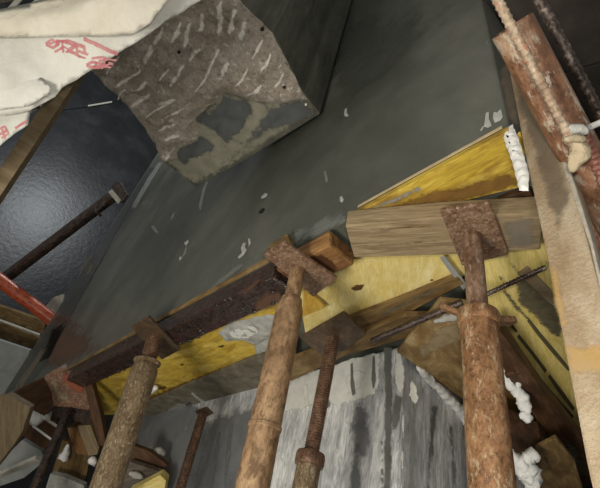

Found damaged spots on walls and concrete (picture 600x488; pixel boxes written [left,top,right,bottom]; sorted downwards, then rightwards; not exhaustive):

spalling [91,0,307,164]
water stain [137,403,198,488]
water stain [185,411,252,488]
water stain [351,405,368,488]
water stain [381,347,416,488]
water stain [428,407,437,468]